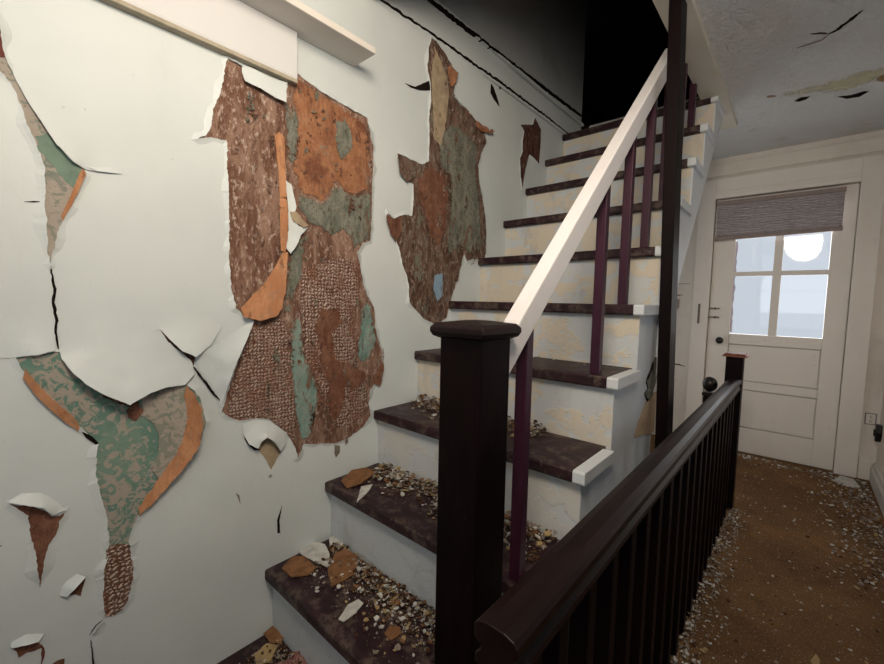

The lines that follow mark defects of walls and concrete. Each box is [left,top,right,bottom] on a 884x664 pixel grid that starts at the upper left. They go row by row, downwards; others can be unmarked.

crack [798,10,863,48]
flaking render [385,37,494,325]
flaking render [519,116,542,191]
flaking render [191,55,384,478]
flaking render [3,493,70,589]
flaking render [60,574,86,597]